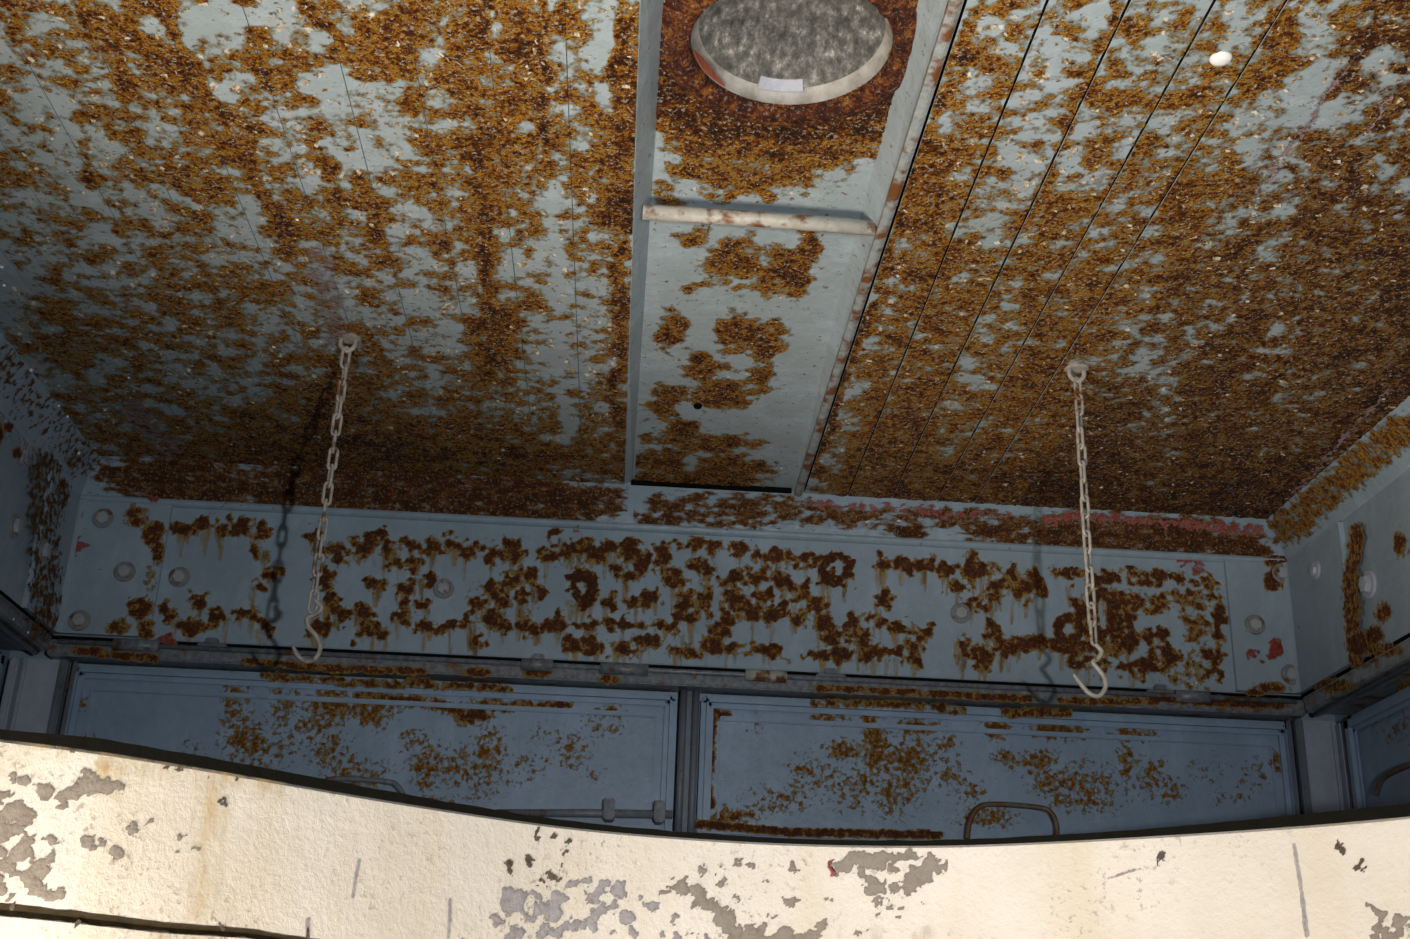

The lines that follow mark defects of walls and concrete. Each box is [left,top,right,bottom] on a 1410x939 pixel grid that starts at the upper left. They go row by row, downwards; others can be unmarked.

rust [0,0,1410,641]
rust [72,646,160,664]
rust [217,657,623,803]
rust [300,523,1291,840]
rust [1312,522,1404,694]
peeling [0,768,154,902]
peeling [489,827,829,939]
peeling [827,845,948,937]
peeling [1365,902,1410,939]